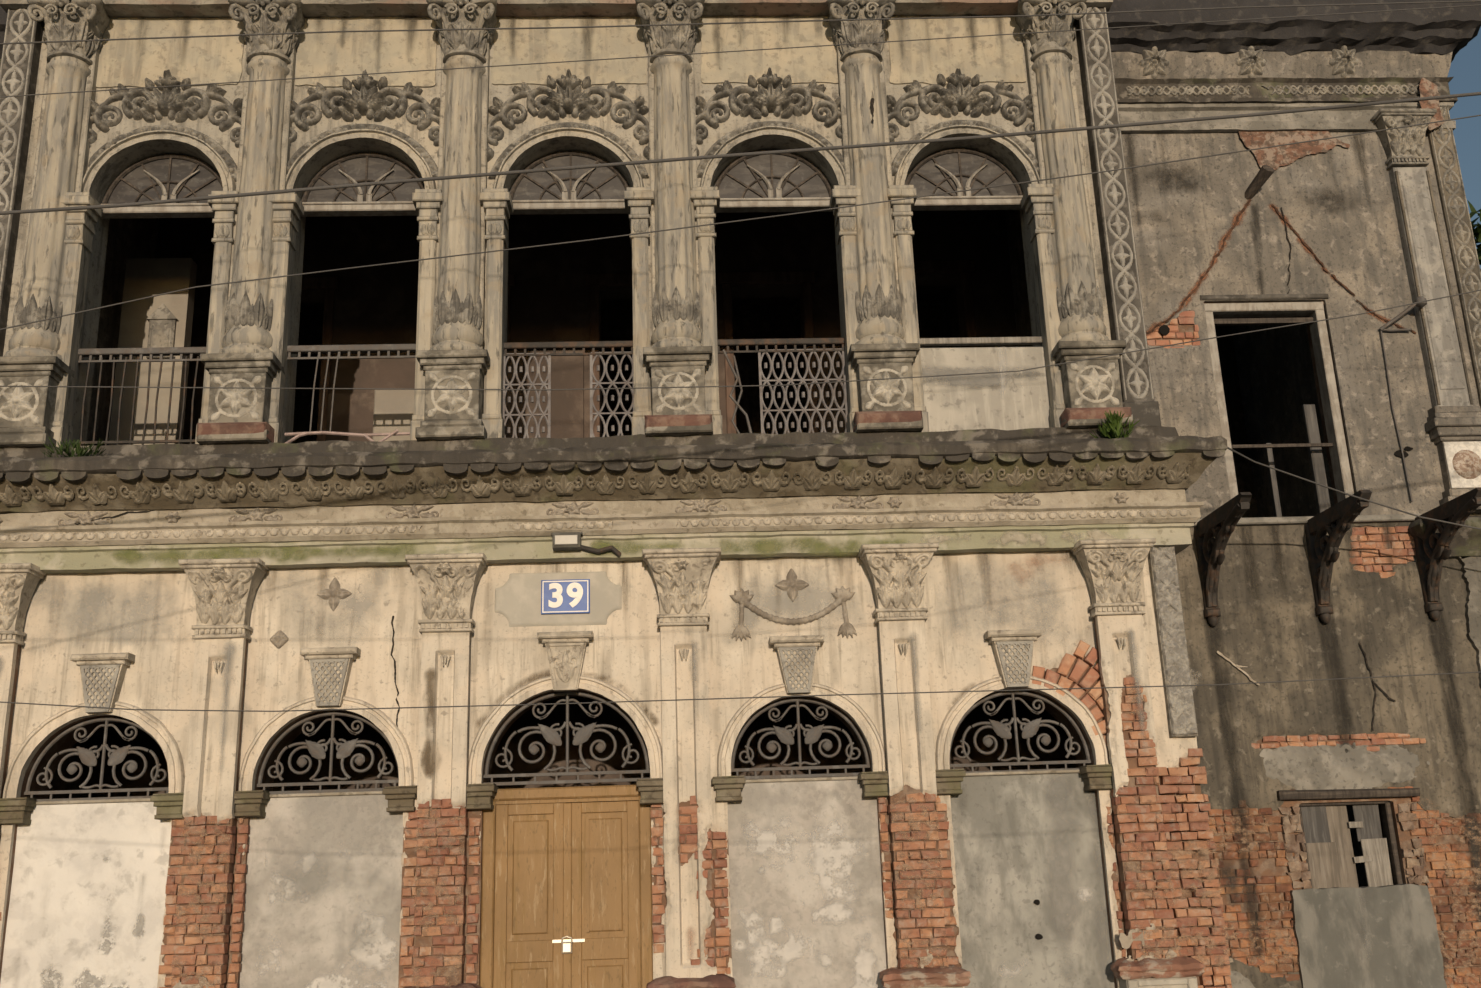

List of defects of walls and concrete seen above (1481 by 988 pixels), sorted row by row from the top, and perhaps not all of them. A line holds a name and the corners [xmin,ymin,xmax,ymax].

flaking render [1238,130,1350,170]
flaking render [1147,311,1200,349]
flaking render [1349,526,1416,578]
peeling [42,970,125,988]
flaking render [158,816,280,988]
flaking render [306,799,481,988]
peeling [651,795,862,978]
peeling [852,947,876,988]
flaking render [878,793,959,968]
flaking render [1032,640,1300,988]
flaking render [1251,733,1426,751]
flaking render [1387,786,1481,988]